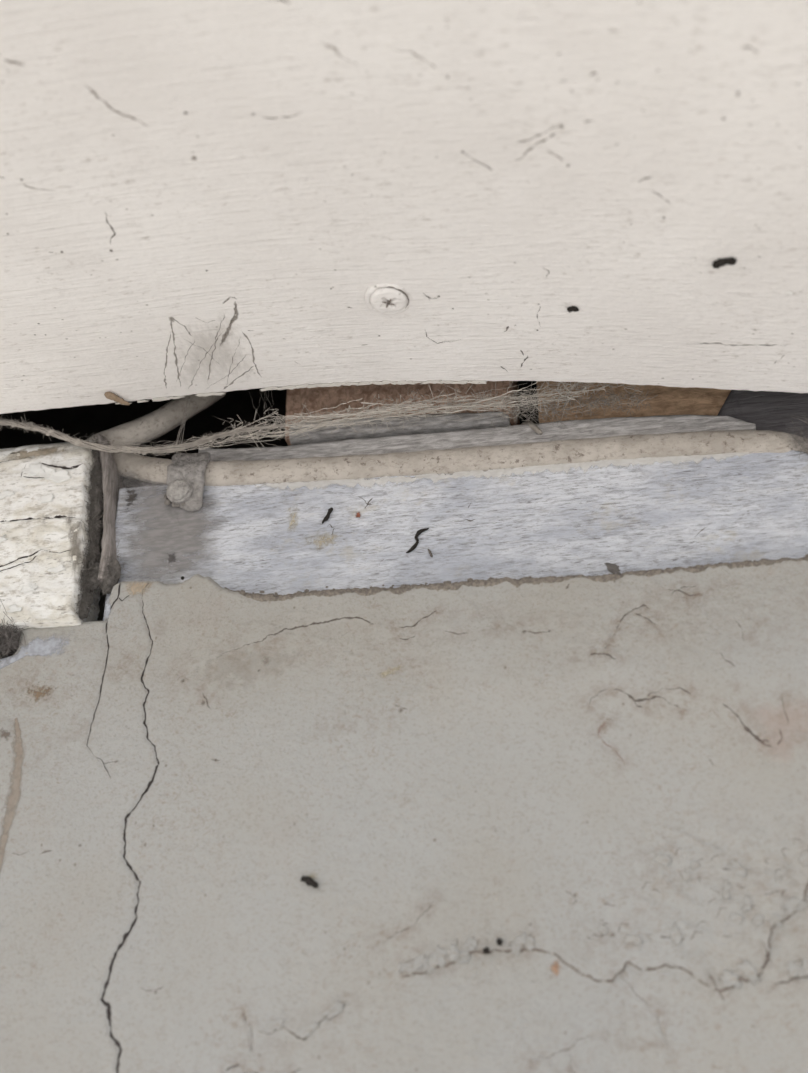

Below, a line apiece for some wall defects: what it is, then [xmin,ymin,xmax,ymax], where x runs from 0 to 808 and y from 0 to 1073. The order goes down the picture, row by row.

crack [0,514,76,522]
crack [0,549,70,572]
crack [216,617,370,659]
crack [400,611,436,640]
crack [87,583,159,1073]